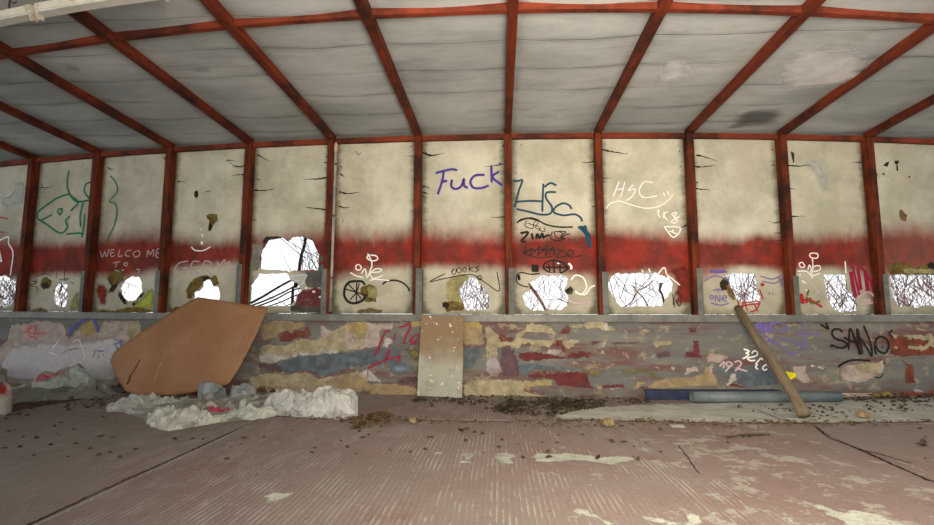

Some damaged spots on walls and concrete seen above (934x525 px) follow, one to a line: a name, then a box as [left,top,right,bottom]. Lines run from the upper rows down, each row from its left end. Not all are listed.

spalling [442,274,469,312]
spalling [720,277,735,300]
peeling [250,255,418,395]
peeling [0,320,141,387]
peeling [463,321,934,423]
crack [688,410,934,482]
peeling [494,453,515,464]
peeling [530,452,634,465]
peeling [573,508,614,525]
peeling [638,512,717,525]
peeling [812,504,904,525]